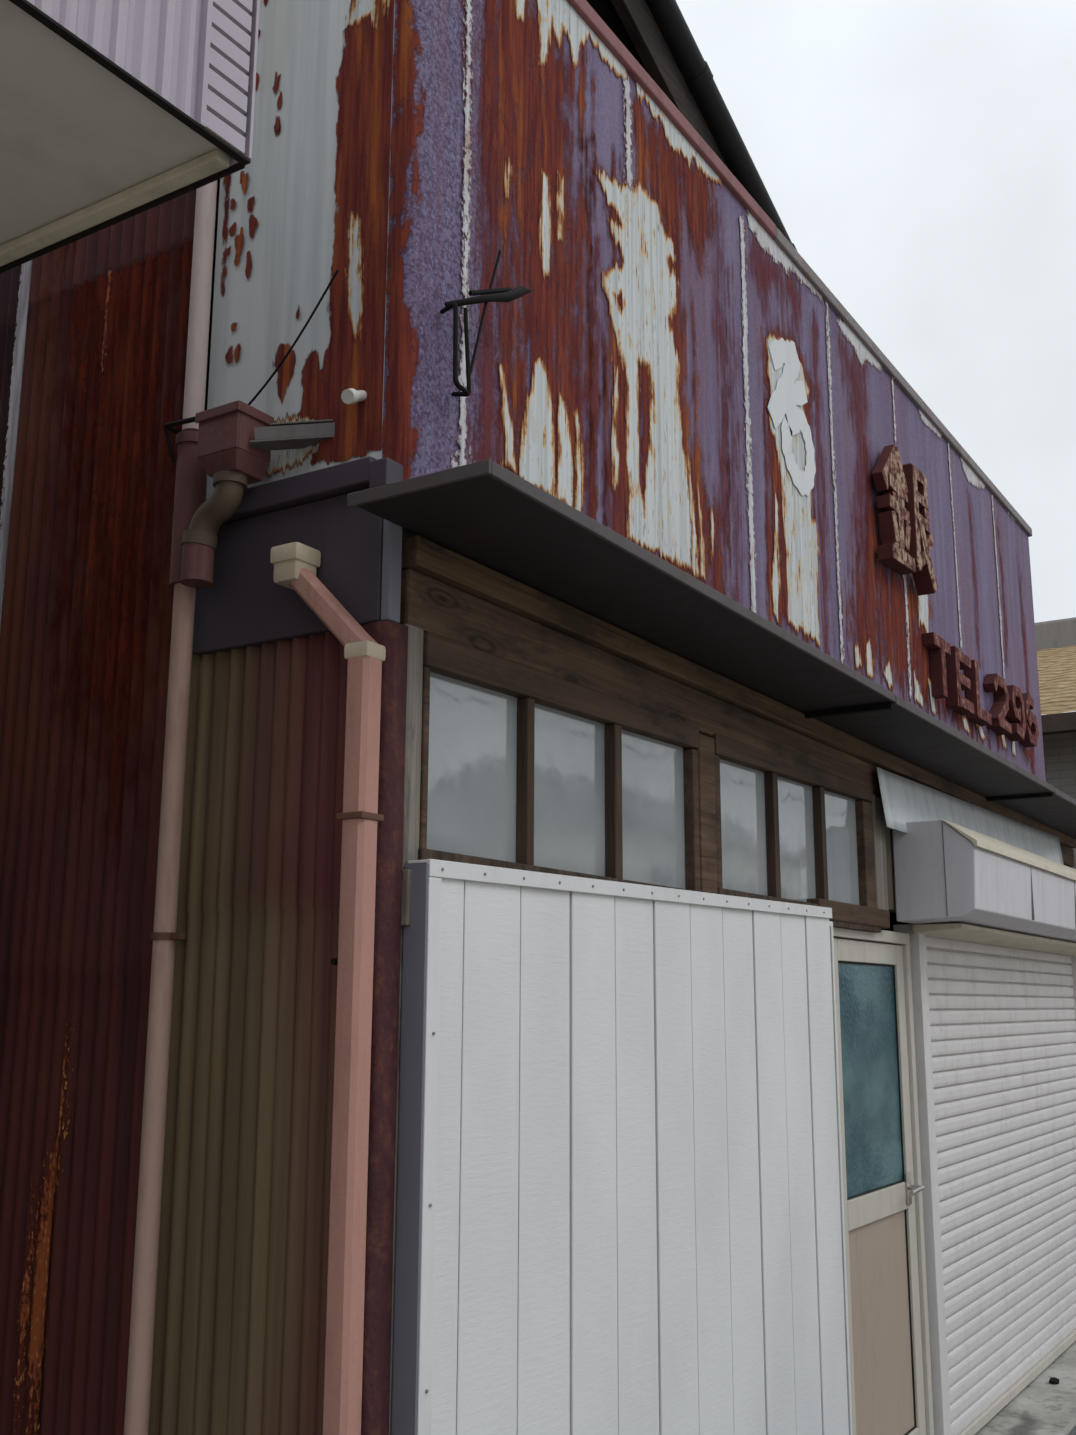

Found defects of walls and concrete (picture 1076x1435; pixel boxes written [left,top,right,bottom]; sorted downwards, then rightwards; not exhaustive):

rust [99,270,115,392]
rust [225,322,241,364]
rust [221,171,258,297]
rust [255,72,282,135]
rust [272,0,426,480]
peeling [503,157,514,200]
peeling [499,356,585,513]
peeling [514,0,722,580]
rust [461,0,1006,751]
peeling [739,209,936,715]
rust [997,522,1029,693]
rust [13,1019,74,1435]